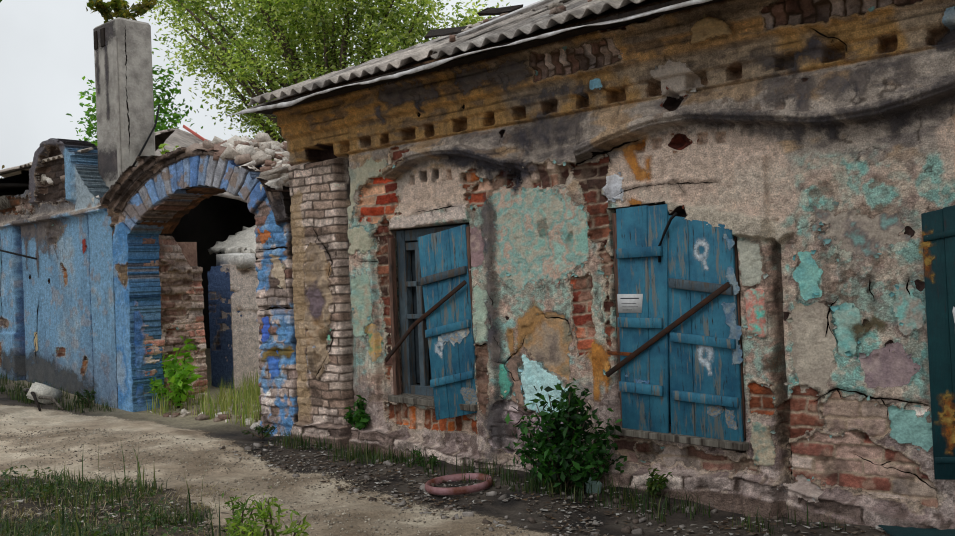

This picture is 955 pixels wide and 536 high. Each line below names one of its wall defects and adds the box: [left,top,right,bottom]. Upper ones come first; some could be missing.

flaking render [761,0,923,30]
damp [679,35,955,144]
peeling [257,228,286,290]
flaking render [347,146,409,380]
rust [919,232,934,281]
peeling [261,316,270,342]
peeling [385,154,624,460]
peeling [267,350,280,379]
flaking render [611,234,938,508]
crack [814,388,927,416]
rust [939,392,955,454]
crack [854,454,935,489]